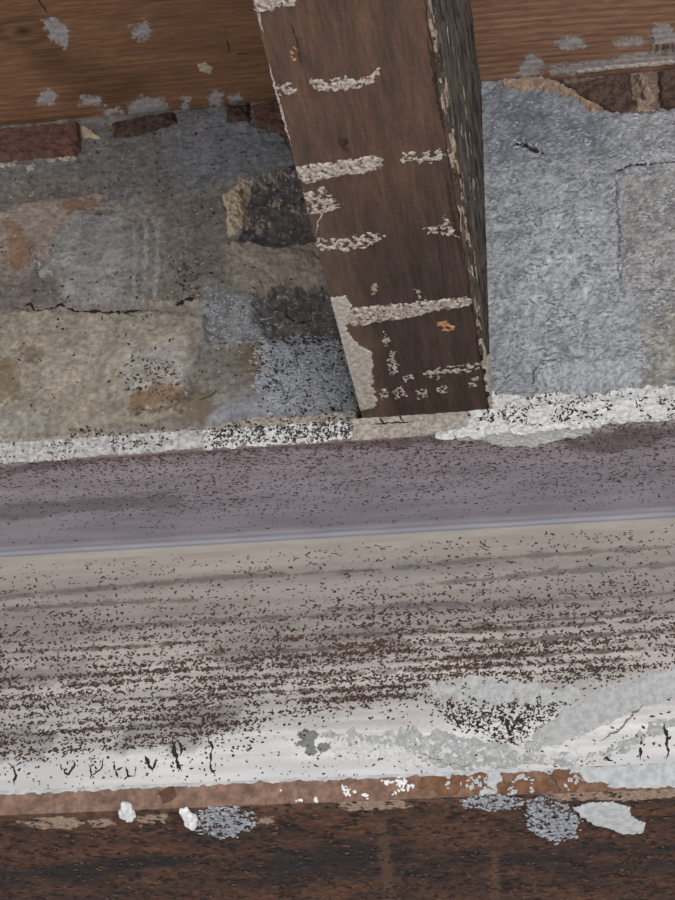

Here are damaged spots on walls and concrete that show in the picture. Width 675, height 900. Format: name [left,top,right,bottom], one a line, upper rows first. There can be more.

flaking render [0,112,183,180]
flaking render [225,101,288,138]
crack [613,161,675,298]
crack [15,302,145,315]
spalling [201,151,361,449]
peeling [0,720,675,900]